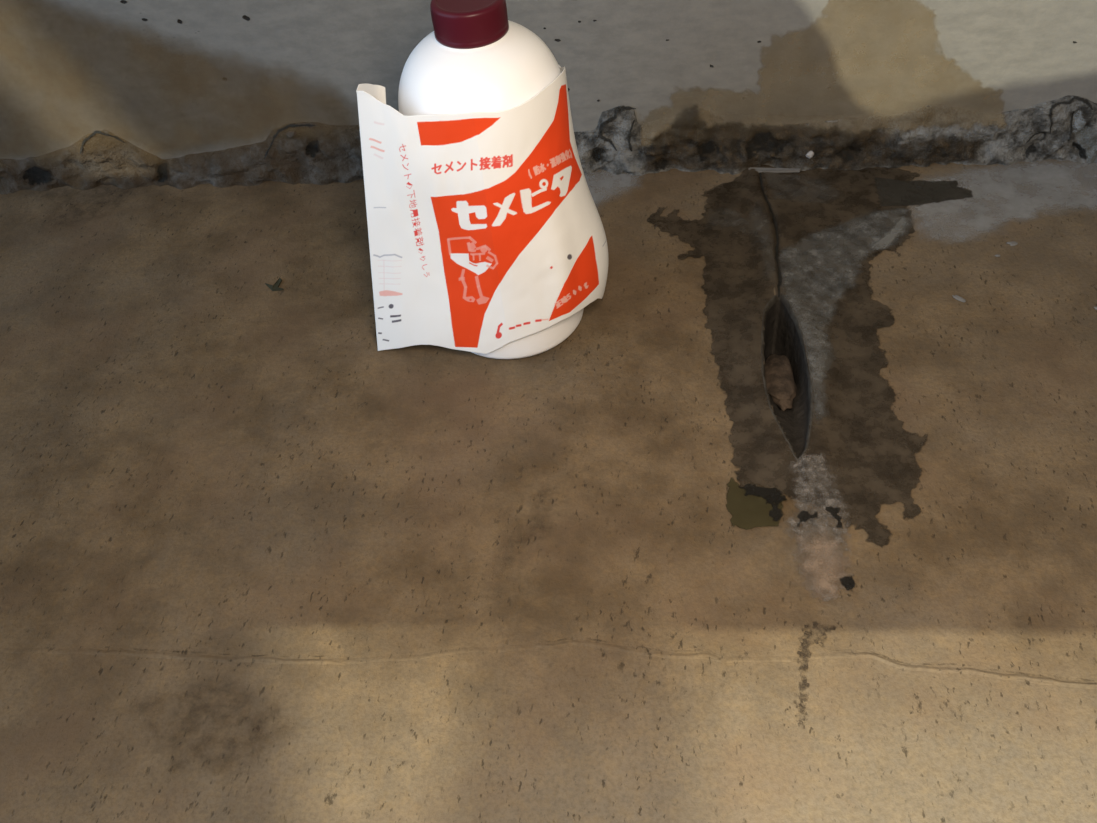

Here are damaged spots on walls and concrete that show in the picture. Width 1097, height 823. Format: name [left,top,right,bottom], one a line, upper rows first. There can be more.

peeling [1073,111,1097,162]
crack [759,172,813,460]
damp [641,0,1006,600]